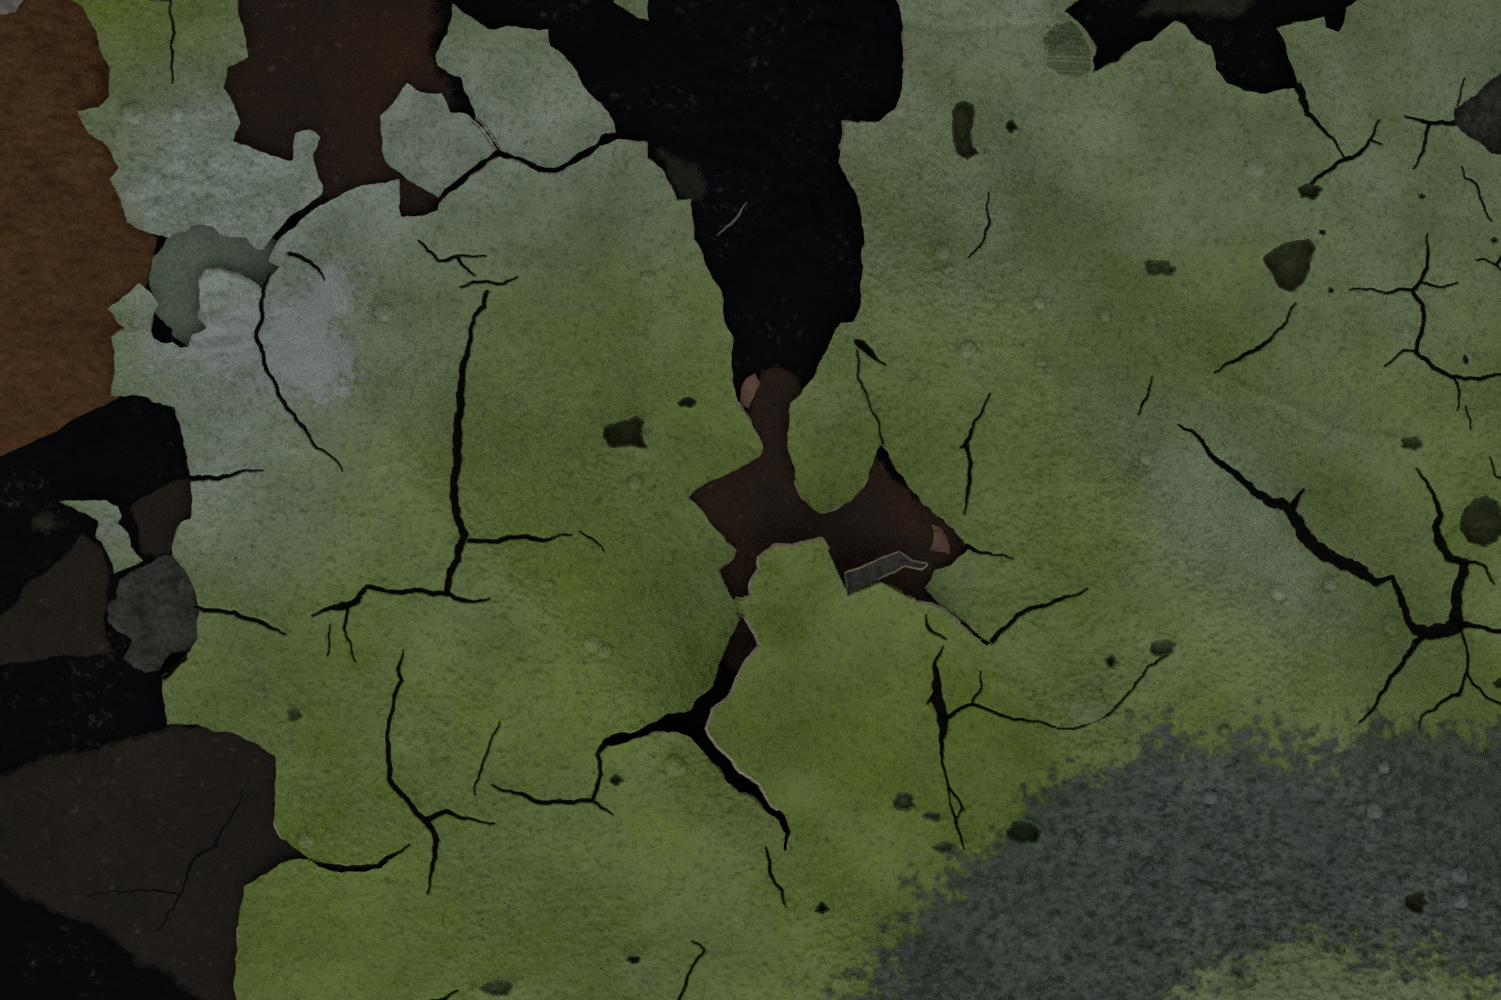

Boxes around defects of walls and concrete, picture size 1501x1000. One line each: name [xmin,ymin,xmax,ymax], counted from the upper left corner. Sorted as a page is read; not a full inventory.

flaking render [0,0,323,456]
spalling [224,0,497,217]
crack [1293,78,1465,185]
peeling [61,500,143,574]
spalling [107,555,199,673]
spalling [0,724,309,1000]
crack [189,240,604,661]
crack [379,650,613,894]
spalling [689,365,967,607]
crack [926,588,1167,848]
crack [1178,424,1501,729]
crack [1350,234,1501,478]